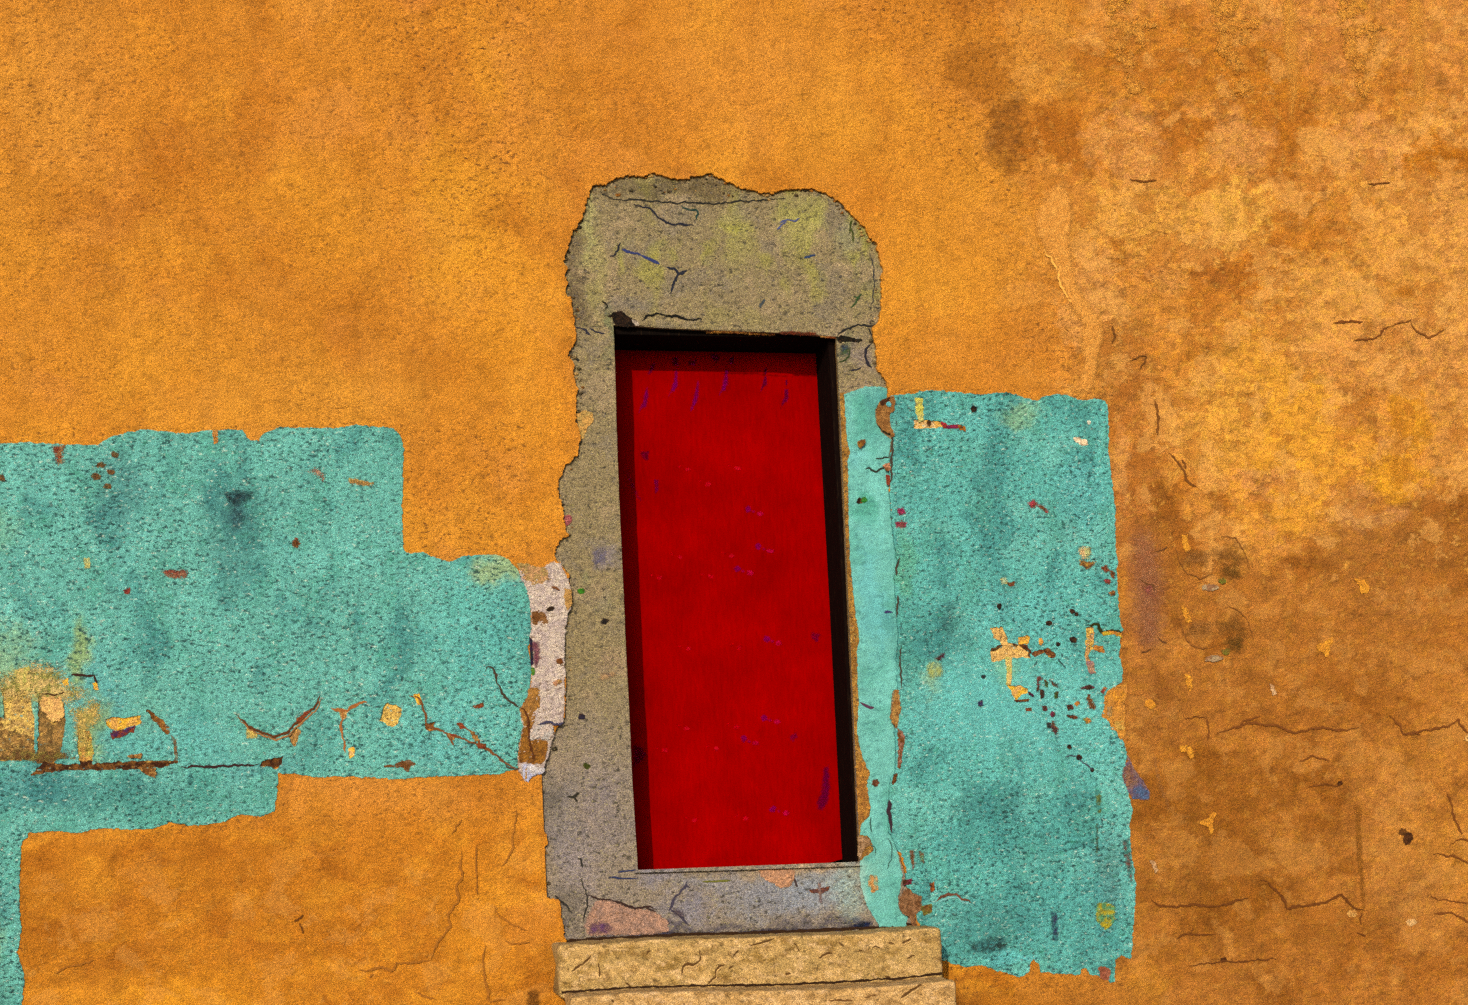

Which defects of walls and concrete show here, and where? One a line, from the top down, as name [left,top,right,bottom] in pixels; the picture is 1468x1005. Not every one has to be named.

spalling [565,174,876,470]
crack [1334,320,1444,341]
peeling [0,662,178,778]
crack [181,696,367,769]
crack [409,666,564,770]
flaking render [517,554,585,782]
peeling [855,689,905,858]
peeling [981,603,1128,740]
crack [1186,715,1468,787]
crack [1433,793,1468,863]
spalling [546,881,669,936]
crack [1151,880,1366,966]